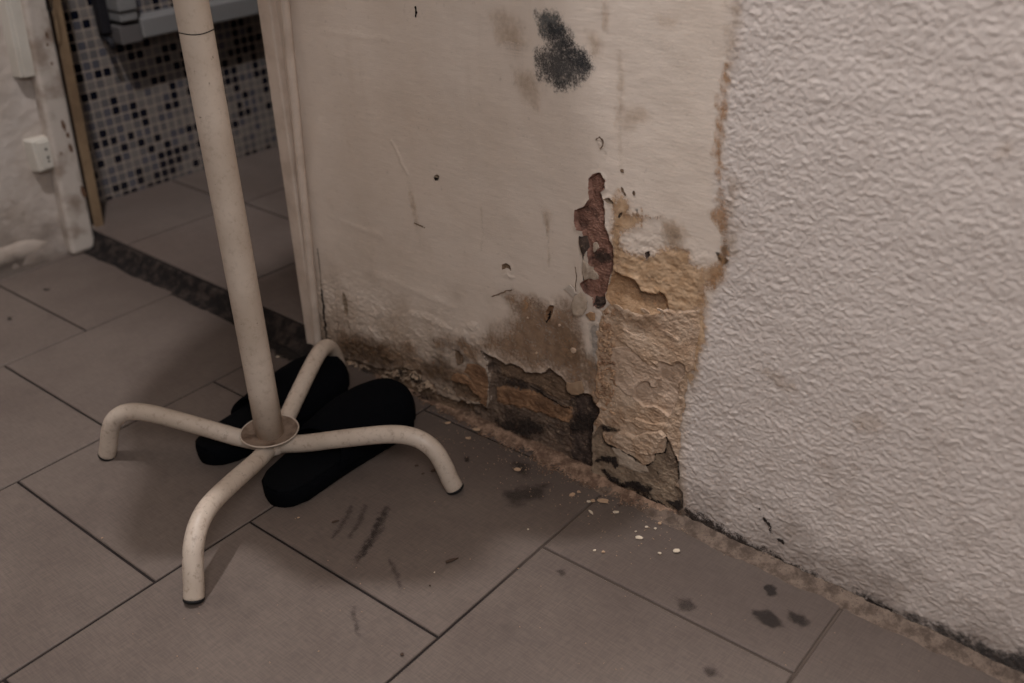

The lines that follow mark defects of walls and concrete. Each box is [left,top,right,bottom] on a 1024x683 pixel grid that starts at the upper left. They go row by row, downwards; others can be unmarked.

leakage [534,9,592,92]
leakage [338,295,586,382]
peeling [344,173,705,513]
leakage [684,508,825,581]
leakage [754,611,805,627]
leakage [856,592,1024,673]